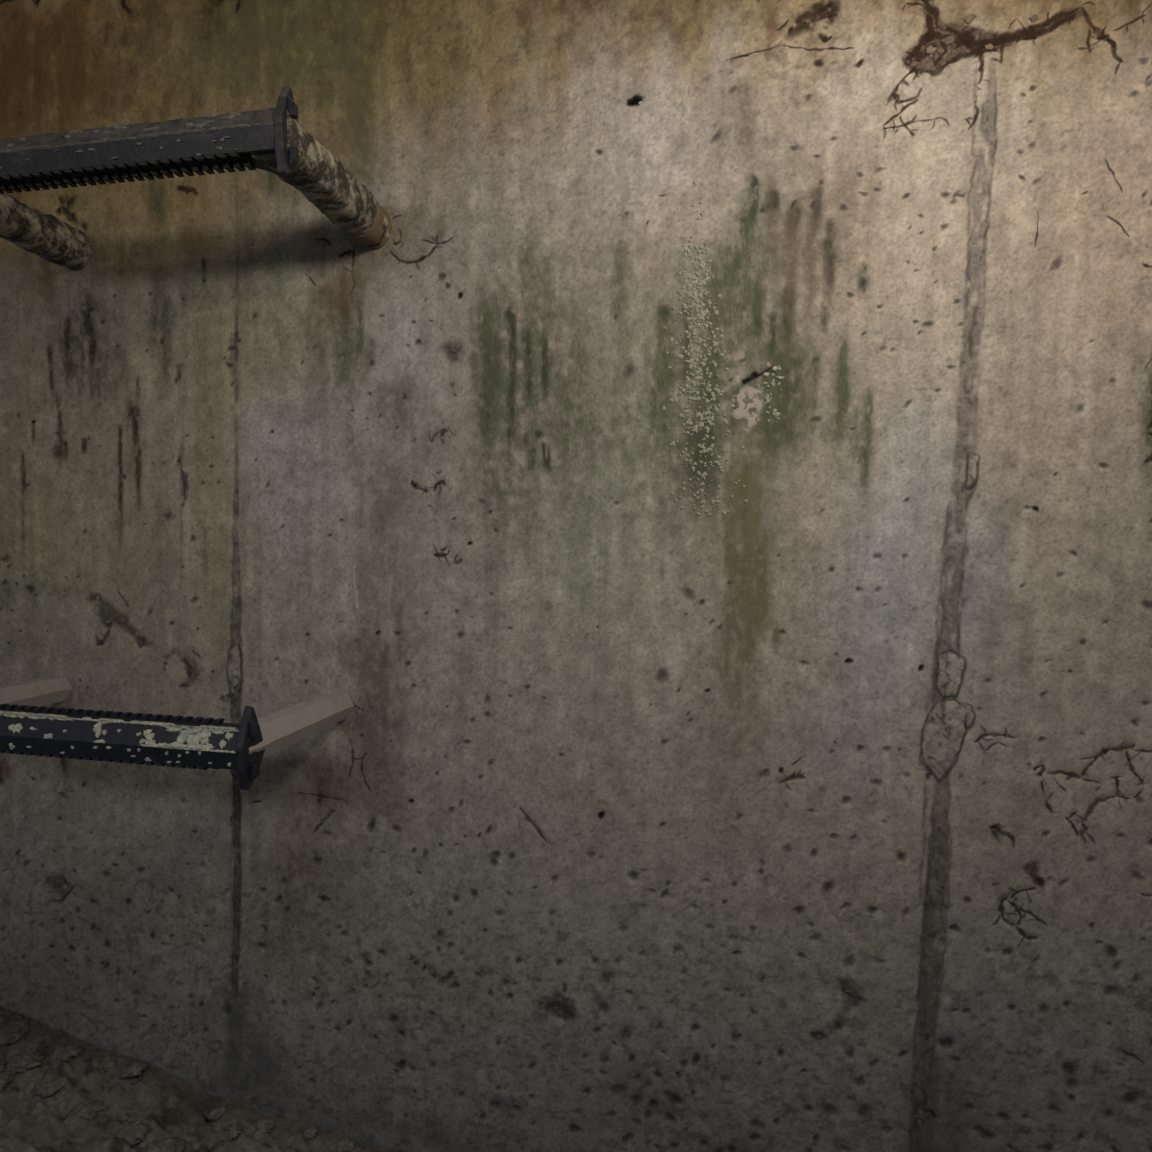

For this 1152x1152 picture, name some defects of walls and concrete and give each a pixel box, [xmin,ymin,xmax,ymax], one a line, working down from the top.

spalling [57,197,87,229]
leakage [788,191,833,294]
leakage [118,408,141,502]
leakage [506,309,550,469]
leakage [655,176,800,638]
leakage [837,341,847,435]
leakage [862,395,873,476]
crack [919,652,1014,781]
crack [299,739,370,832]
crack [1033,741,1152,843]
crack [994,887,1045,946]